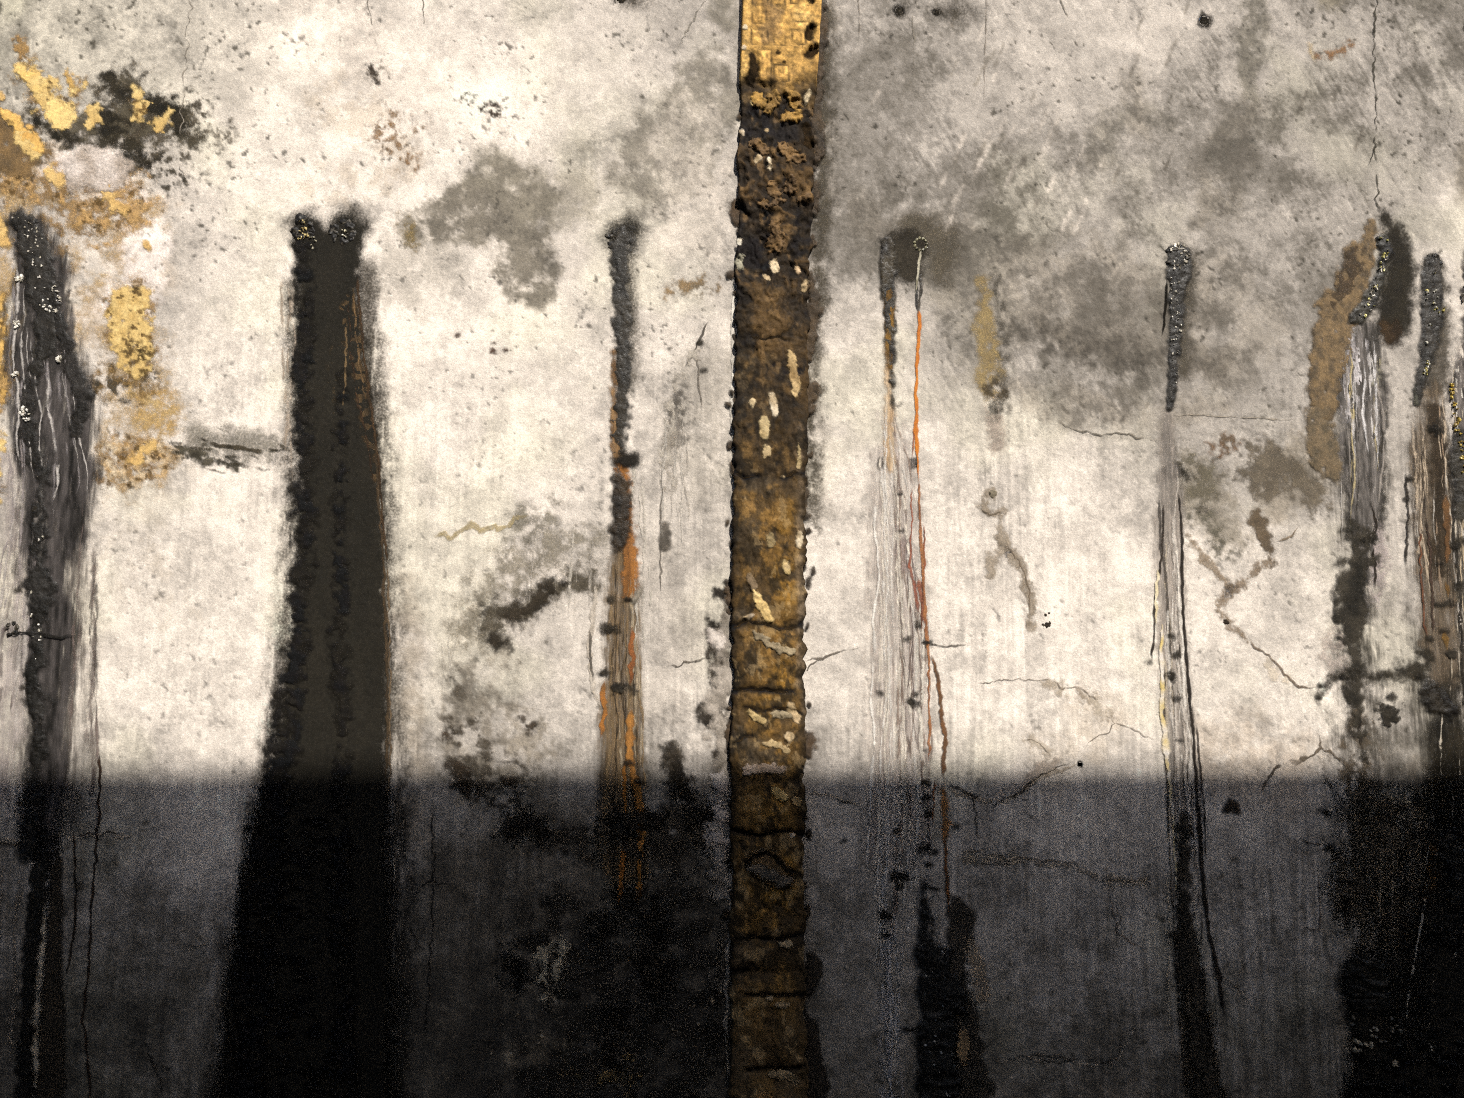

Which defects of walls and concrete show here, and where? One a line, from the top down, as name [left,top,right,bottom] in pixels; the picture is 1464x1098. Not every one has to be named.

peeling [0,293,11,413]
peeling [0,35,158,257]
damp [0,181,180,1098]
peeling [91,278,180,492]
peeling [129,84,175,133]
damp [204,216,417,1098]
damp [438,223,733,1098]
corrosion [908,252,951,908]
damp [867,213,996,1098]
damp [1148,209,1464,1098]
crack [1370,0,1383,221]